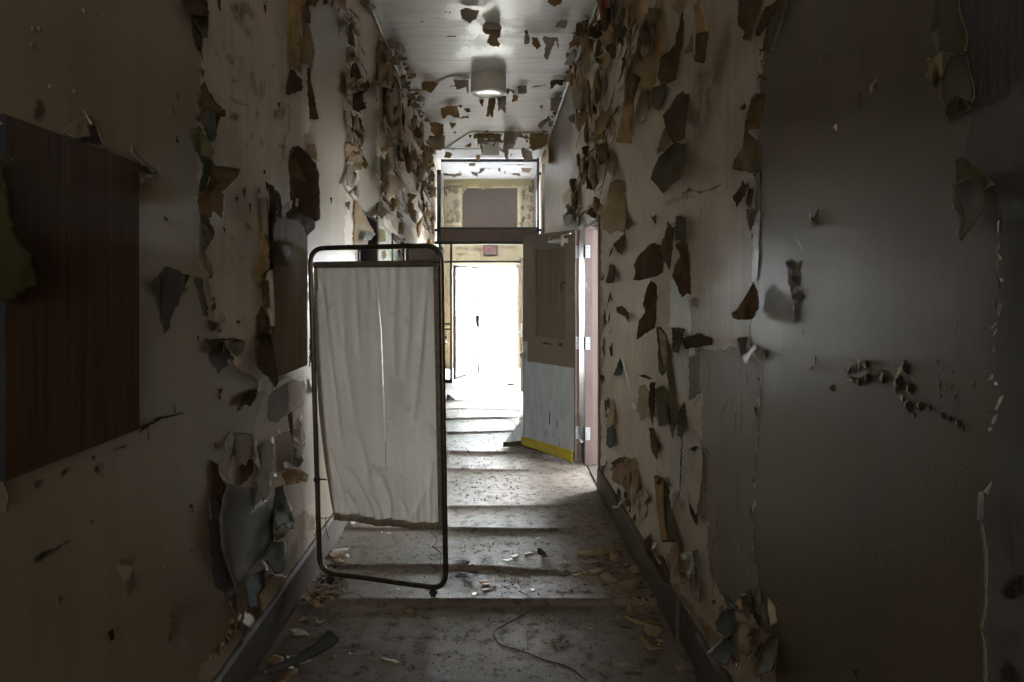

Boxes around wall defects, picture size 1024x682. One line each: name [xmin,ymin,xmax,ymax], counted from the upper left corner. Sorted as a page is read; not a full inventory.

peeling [950,157,995,241]
peeling [785,258,804,334]
peeling [149,0,779,682]
crack [139,406,183,441]